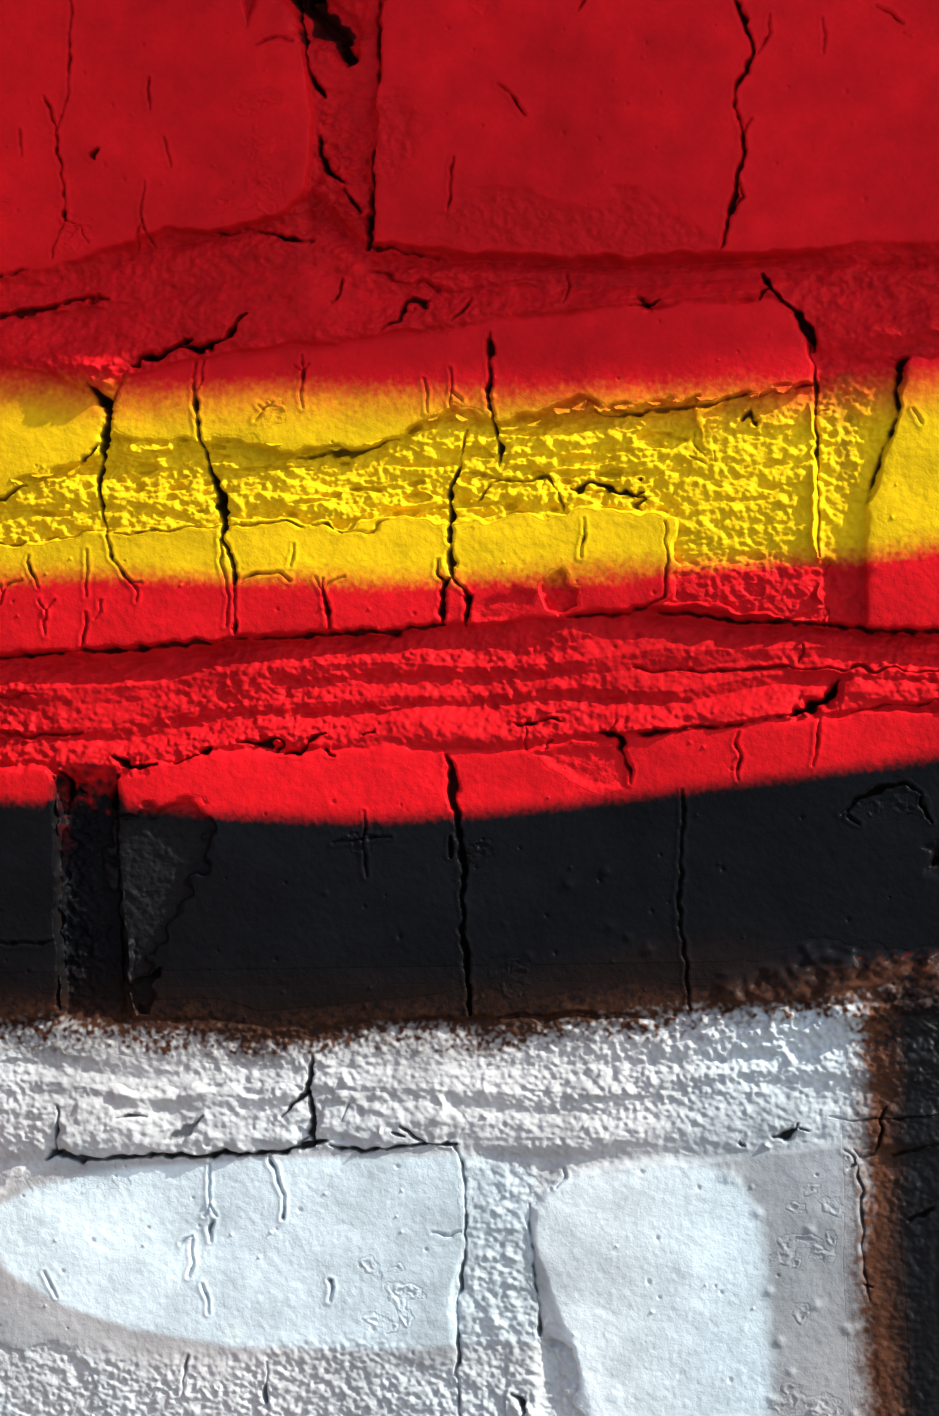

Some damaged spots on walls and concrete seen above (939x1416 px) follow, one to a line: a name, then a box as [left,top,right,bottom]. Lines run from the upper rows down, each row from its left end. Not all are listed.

crack [253,34,293,46]
crack [576,0,586,11]
crack [875,4,904,25]
crack [496,82,527,117]
crack [717,0,772,254]
crack [446,156,455,212]
crack [366,241,587,627]
crack [0,354,400,656]
spalling [100,794,217,989]
crack [444,754,472,1017]
crack [115,1112,147,1120]
crack [341,1103,350,1121]